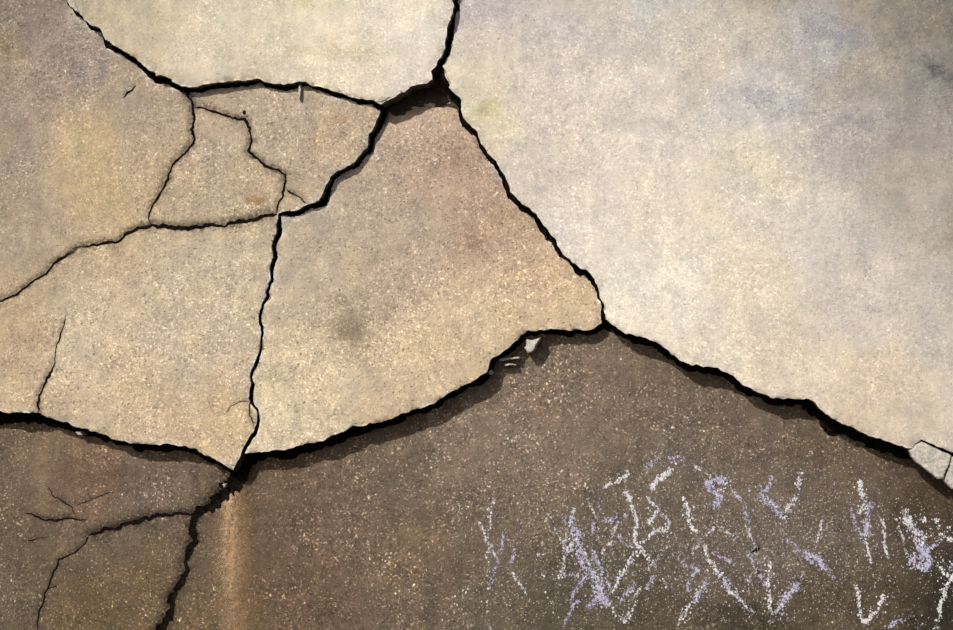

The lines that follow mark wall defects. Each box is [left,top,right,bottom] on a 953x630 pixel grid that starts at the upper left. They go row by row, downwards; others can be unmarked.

crack [437,0,911,459]
crack [0,38,491,630]
spalling [498,337,542,366]
flaking render [907,441,953,489]
crack [920,440,953,457]